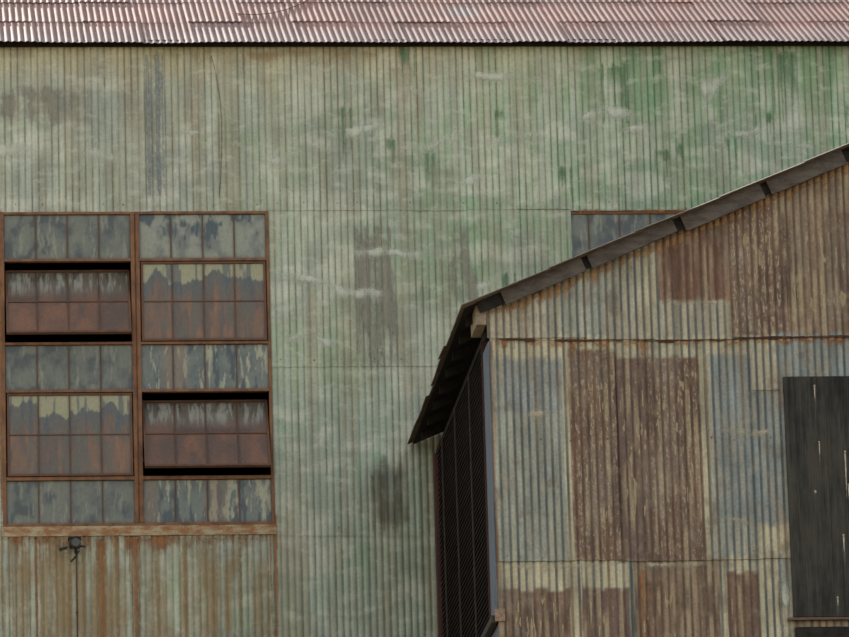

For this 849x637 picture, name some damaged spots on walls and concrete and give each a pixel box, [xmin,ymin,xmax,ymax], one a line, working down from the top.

water stain [145,56,165,192]
water stain [335,228,420,361]
corrosion [500,335,849,352]
corrosion [35,536,69,637]
corrosion [84,535,188,637]
corrosion [223,534,278,637]